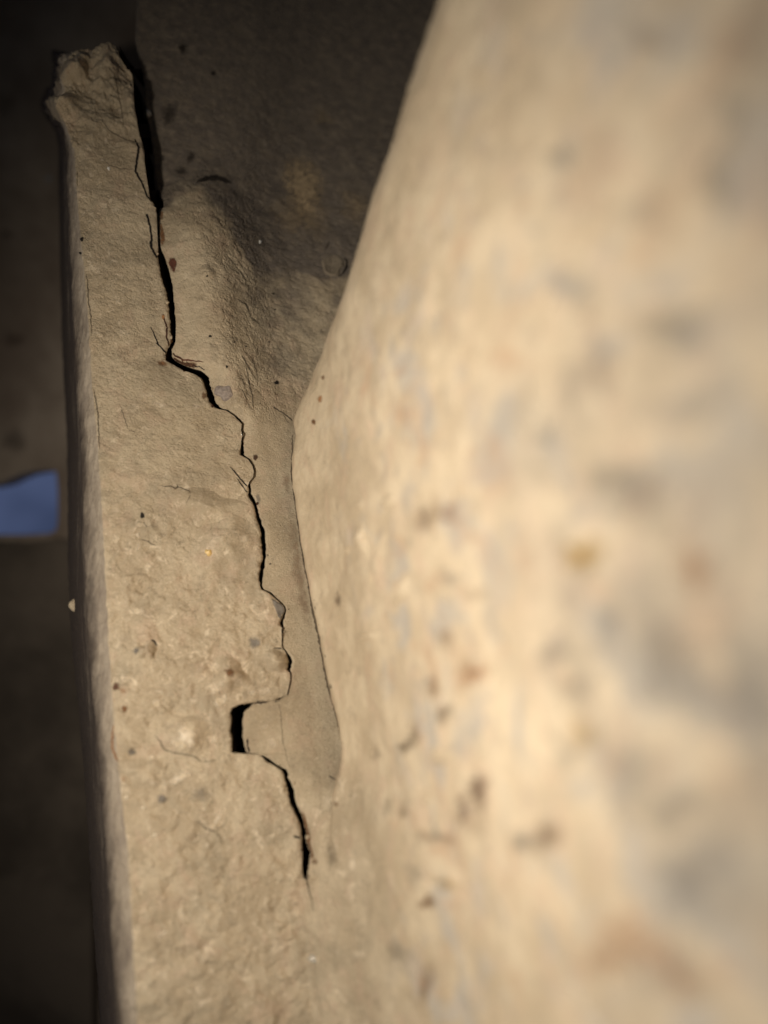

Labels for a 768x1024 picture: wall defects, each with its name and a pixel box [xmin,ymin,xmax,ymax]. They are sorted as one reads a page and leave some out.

crack [118,44,144,87]
crack [134,124,314,911]